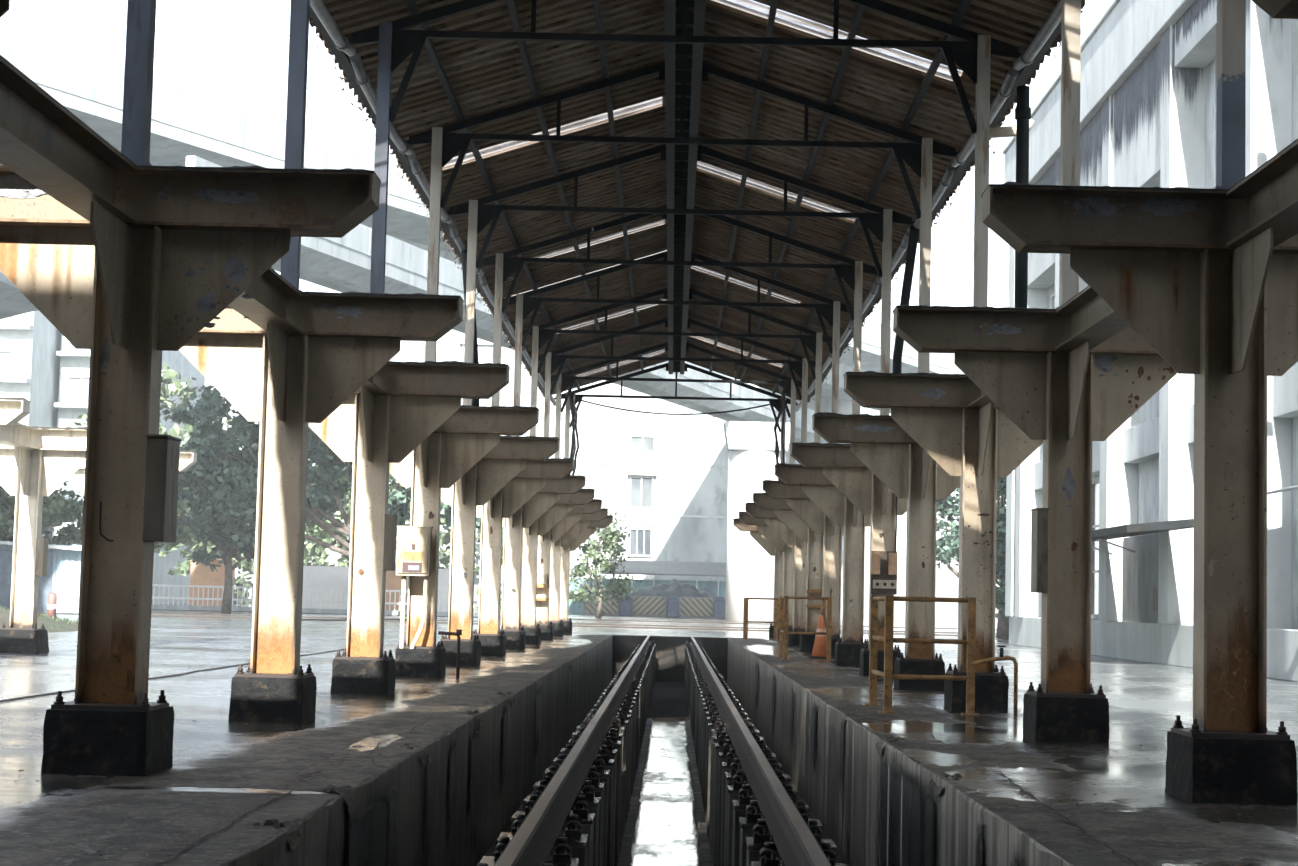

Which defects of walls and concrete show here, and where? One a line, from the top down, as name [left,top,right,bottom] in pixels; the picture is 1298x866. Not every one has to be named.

damp [1080,0,1214,184]
corrosion [255,631,293,674]
corrosion [349,631,379,657]
corrosion [1048,656,1086,693]
corrosion [1207,619,1258,732]
crack [154,785,293,866]